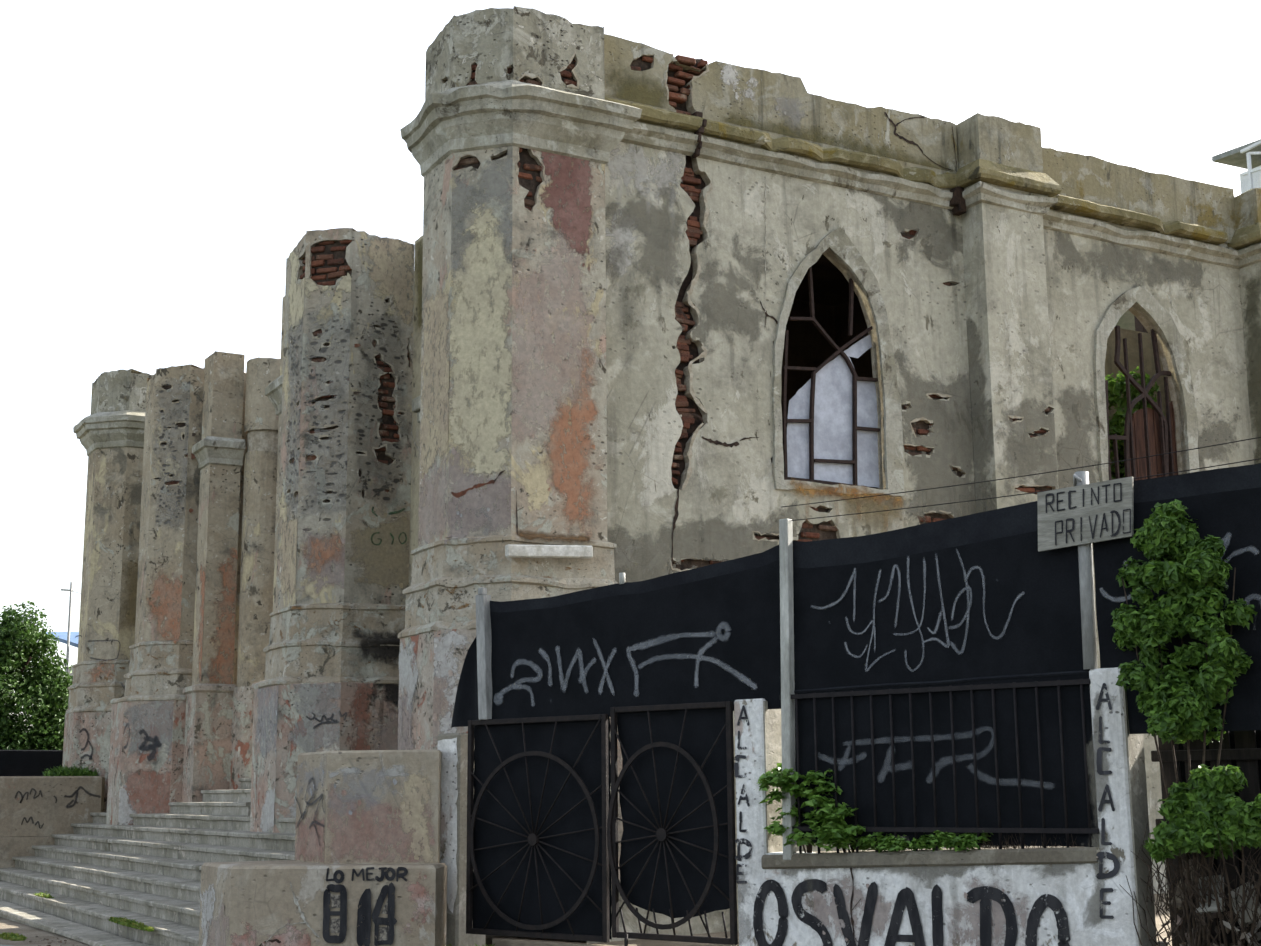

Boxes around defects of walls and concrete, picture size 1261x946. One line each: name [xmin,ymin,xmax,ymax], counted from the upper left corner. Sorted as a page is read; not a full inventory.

spalling [630,56,653,71]
spalling [665,54,758,115]
crack [884,112,957,170]
peeling [451,147,594,271]
leakage [605,143,686,288]
leakage [869,193,963,266]
leakage [680,236,767,345]
crack [671,111,759,566]
spalling [901,404,933,456]
leakage [850,319,1099,520]
spalling [797,505,838,542]
leakage [353,630,418,710]